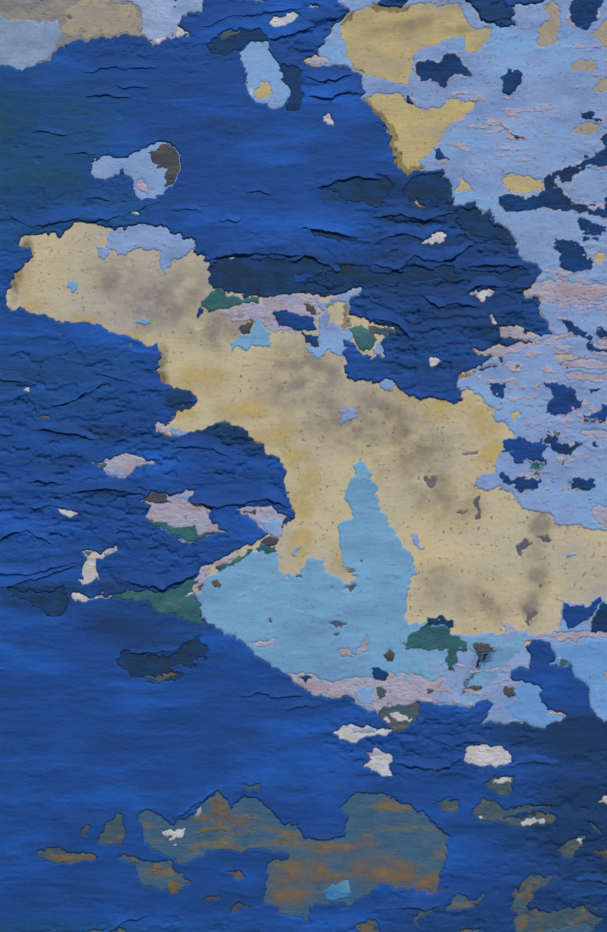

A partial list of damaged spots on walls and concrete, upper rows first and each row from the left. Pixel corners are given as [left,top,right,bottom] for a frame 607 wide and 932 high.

peeling [0,0,607,743]
peeling [363,732,559,796]
peeling [437,798,459,813]